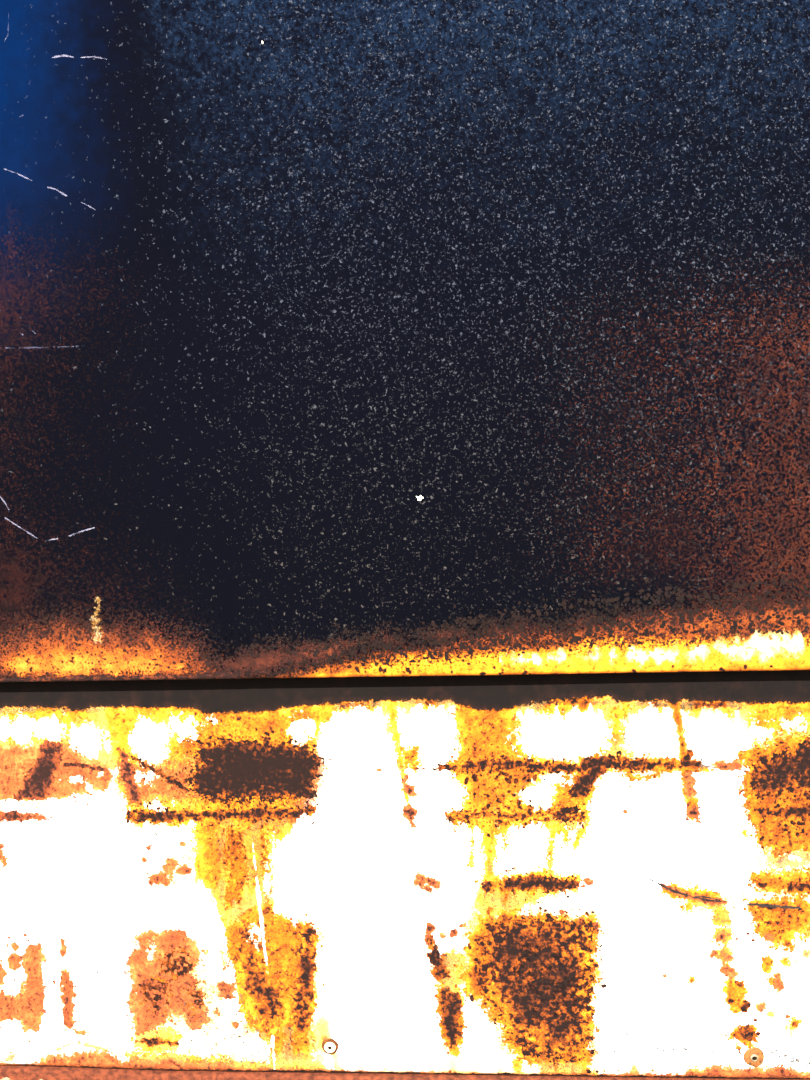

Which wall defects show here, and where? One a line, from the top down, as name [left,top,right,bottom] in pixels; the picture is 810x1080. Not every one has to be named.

corrosion [0,562,810,1079]